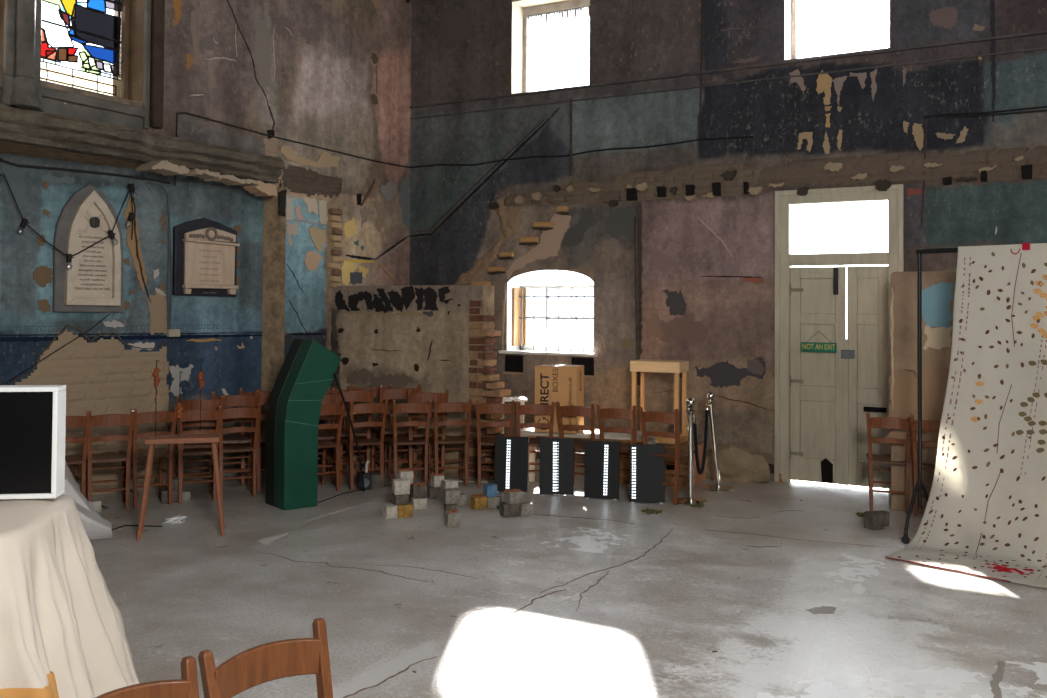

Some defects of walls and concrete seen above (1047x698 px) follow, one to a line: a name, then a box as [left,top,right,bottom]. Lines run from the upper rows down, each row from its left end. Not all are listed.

spalling [135,130,369,286]
spalling [455,69,1047,285]
peeling [10,195,194,495]
crack [488,528,673,624]
water stain [756,660,1047,698]